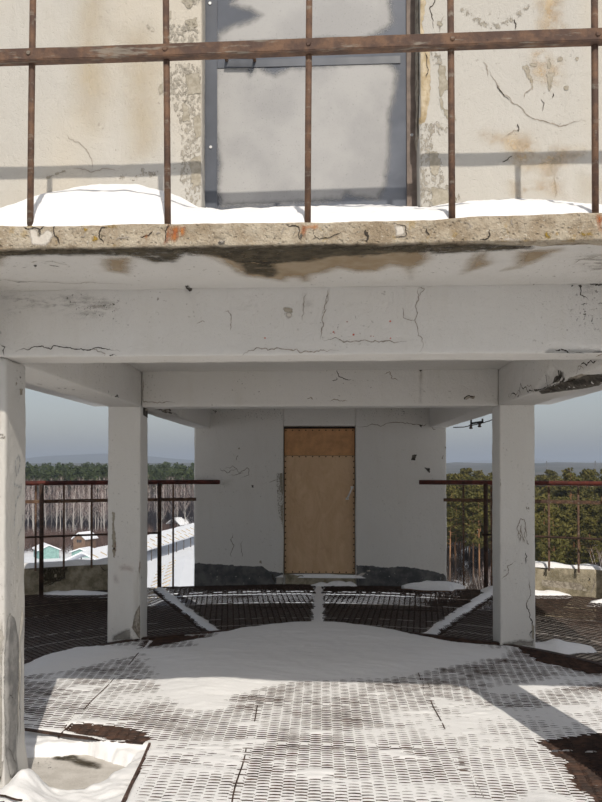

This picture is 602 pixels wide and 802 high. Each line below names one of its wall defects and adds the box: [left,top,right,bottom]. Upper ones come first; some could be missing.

peeling [169,11,199,43]
peeling [158,62,201,204]
peeling [420,53,460,207]
rust [165,224,186,242]
water stain [0,244,552,280]
crack [242,287,425,356]
crack [1,345,114,356]
spalling [534,370,602,394]